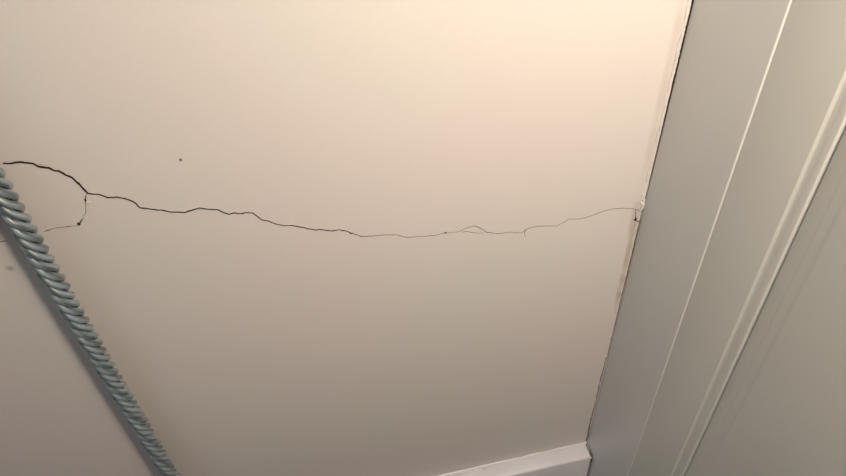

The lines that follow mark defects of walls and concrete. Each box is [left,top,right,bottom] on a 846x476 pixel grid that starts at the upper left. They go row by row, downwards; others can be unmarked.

crack [3,161,574,238]
crack [582,0,694,475]